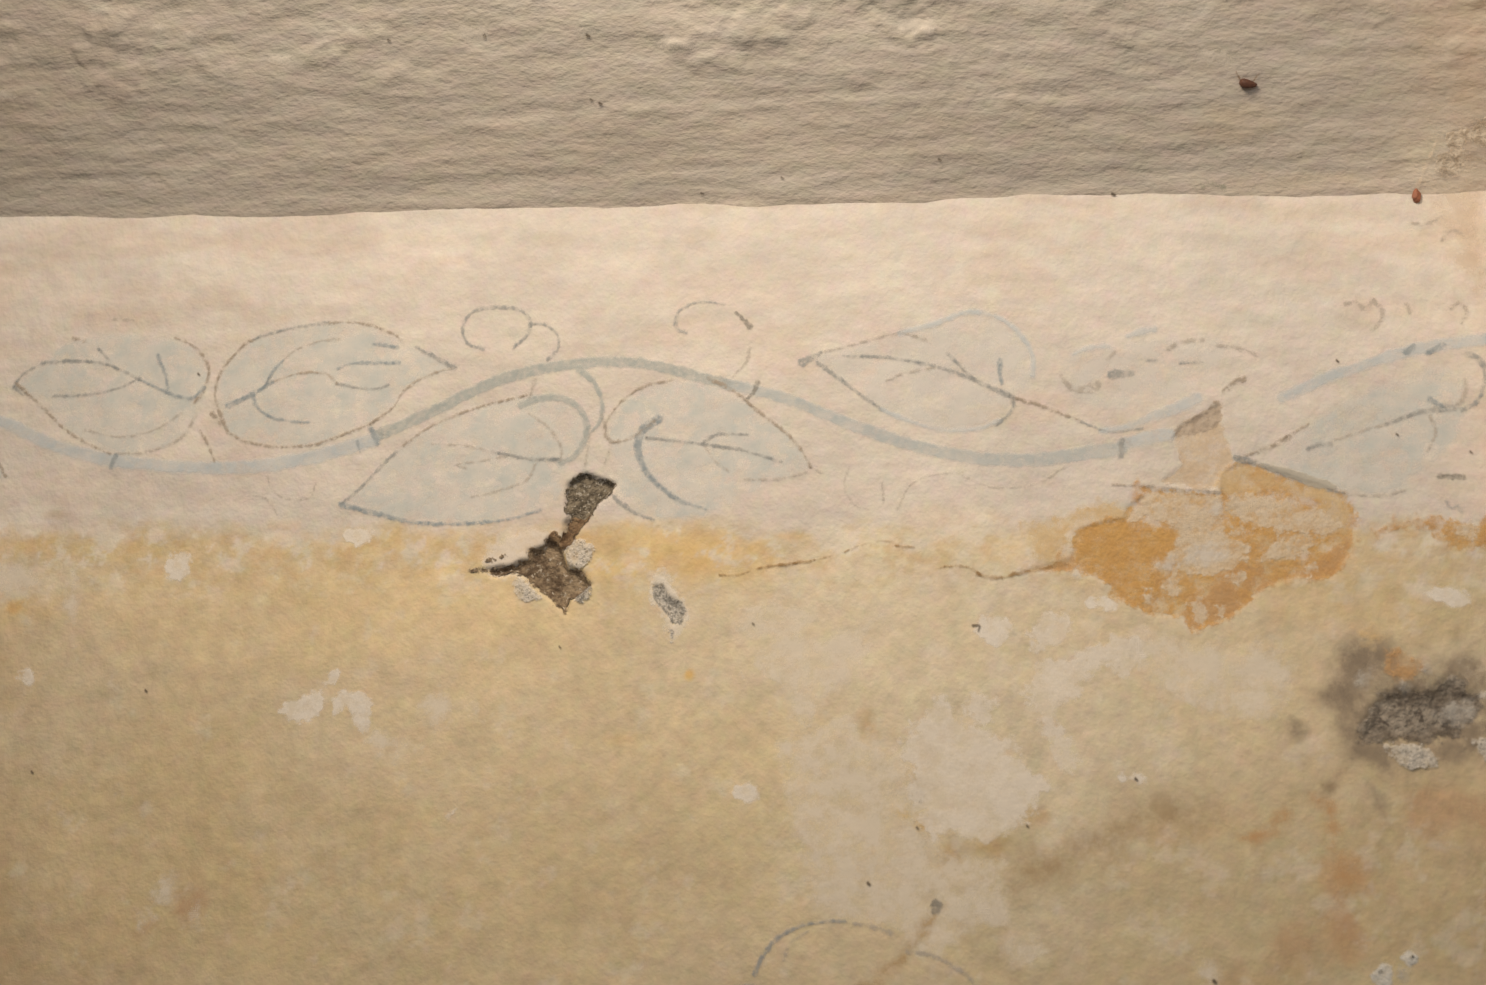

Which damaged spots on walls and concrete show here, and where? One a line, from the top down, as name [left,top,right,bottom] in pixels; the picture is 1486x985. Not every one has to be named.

flaking render [468,473,621,615]
crack [943,564,1075,579]
flaking render [650,576,688,638]